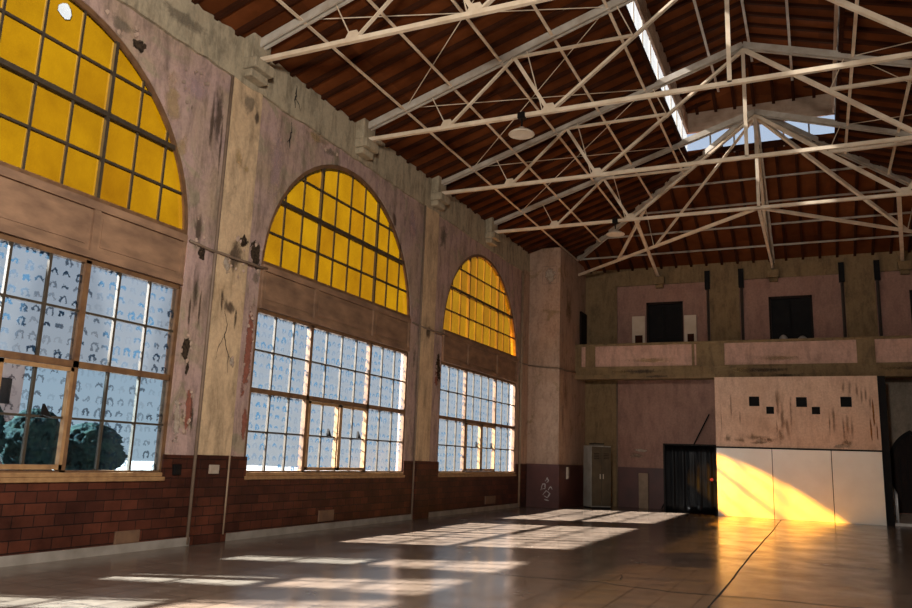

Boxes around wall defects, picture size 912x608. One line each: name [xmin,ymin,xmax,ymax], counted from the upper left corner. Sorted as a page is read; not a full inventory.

leakage [188,282,201,323]